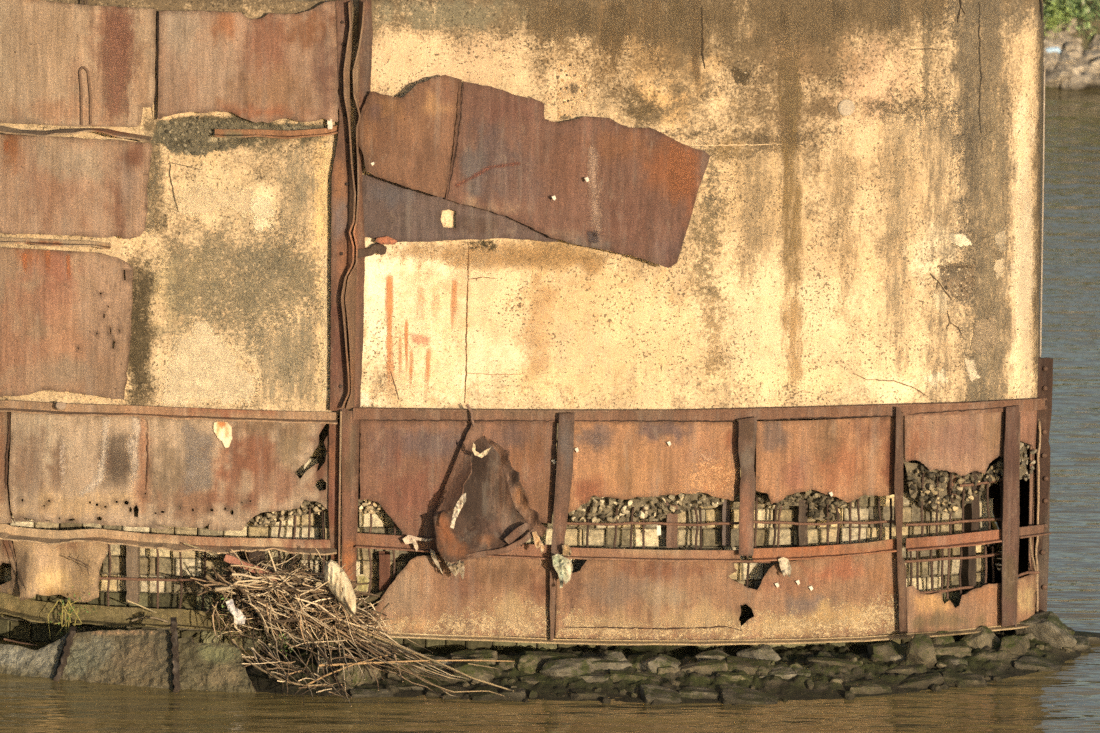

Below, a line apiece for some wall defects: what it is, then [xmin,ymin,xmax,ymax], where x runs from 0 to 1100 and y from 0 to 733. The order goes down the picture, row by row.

rust [102,11,133,117]
damp [521,0,1044,402]
damp [125,148,323,406]
rust [386,276,430,377]
spalling [248,501,327,527]
spalling [568,492,740,523]
rust [665,446,740,496]
spalling [758,490,862,520]
spalling [904,457,1003,514]
spalling [1019,441,1037,481]